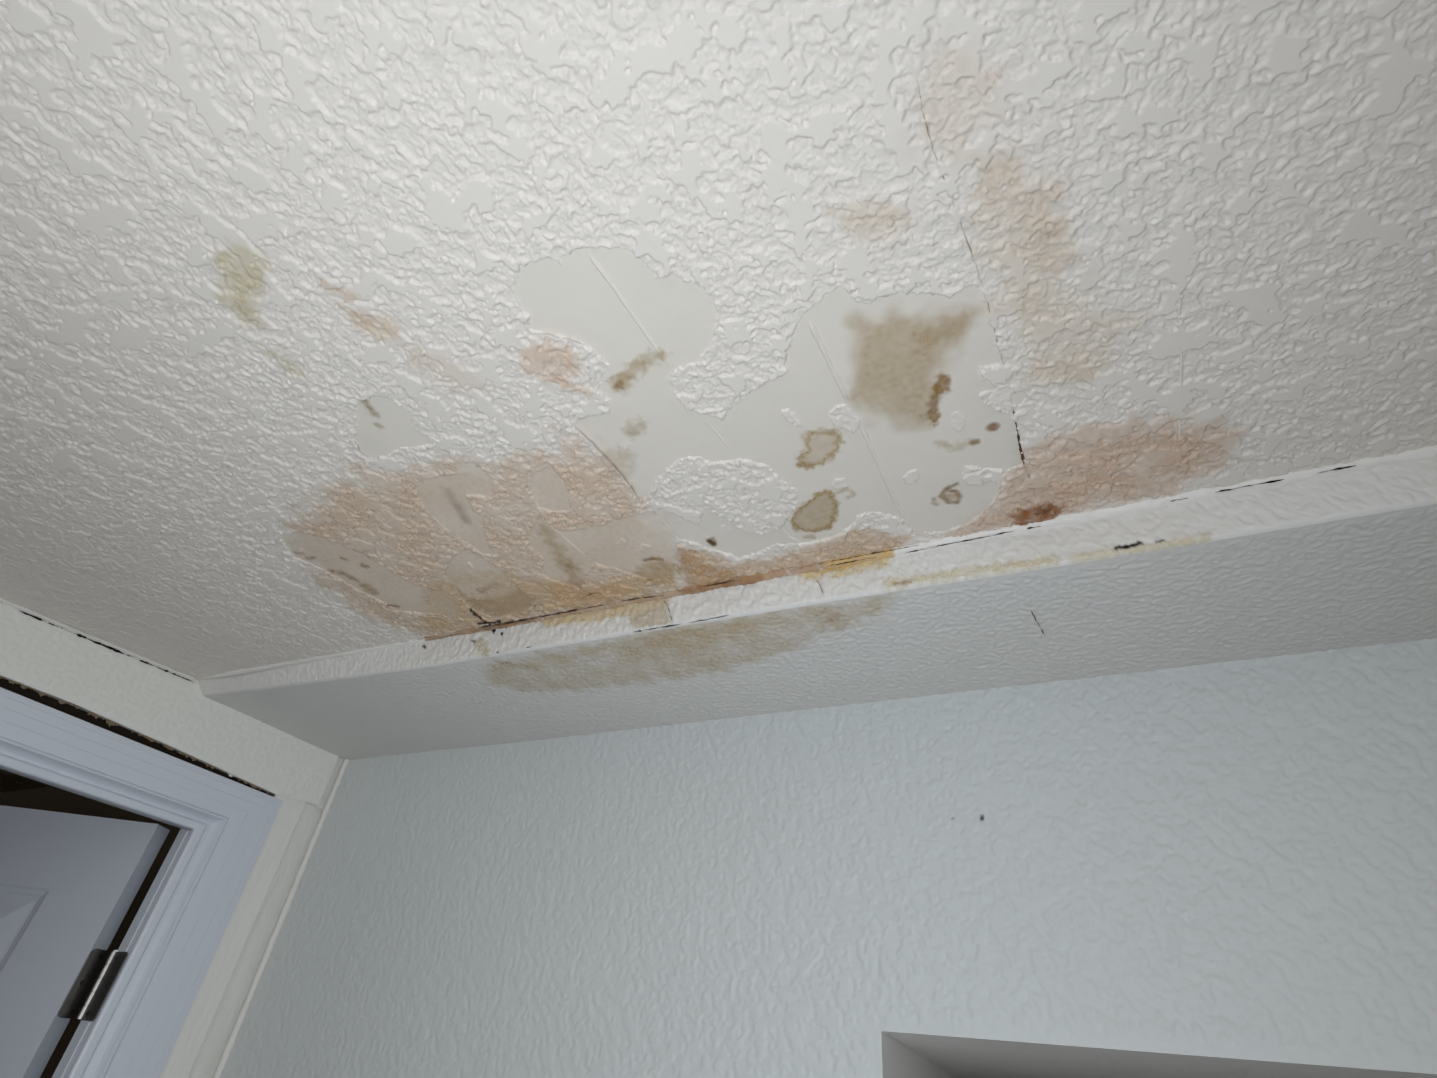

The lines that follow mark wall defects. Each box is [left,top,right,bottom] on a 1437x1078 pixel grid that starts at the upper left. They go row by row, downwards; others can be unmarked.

peeling [516,246,1023,588]
leakage [928,375,950,422]
leakage [797,432,840,468]
leakage [792,491,837,532]
leakage [682,539,735,585]
leakage [421,574,706,652]